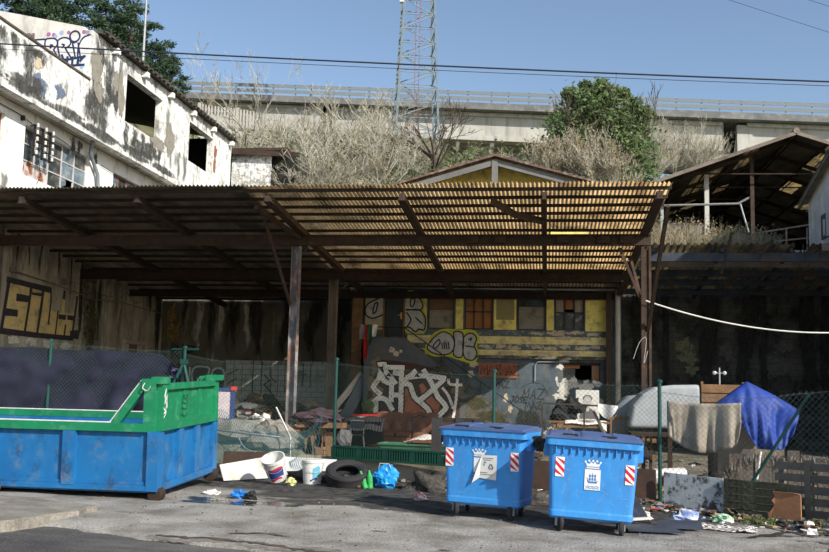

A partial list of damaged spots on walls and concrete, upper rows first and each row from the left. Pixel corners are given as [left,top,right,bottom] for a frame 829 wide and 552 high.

leakage [0,25,187,179]
leakage [10,246,264,357]
leakage [279,300,289,356]
leakage [334,301,350,364]
peeling [451,330,602,424]
leakage [631,294,641,391]
leakage [661,295,829,404]